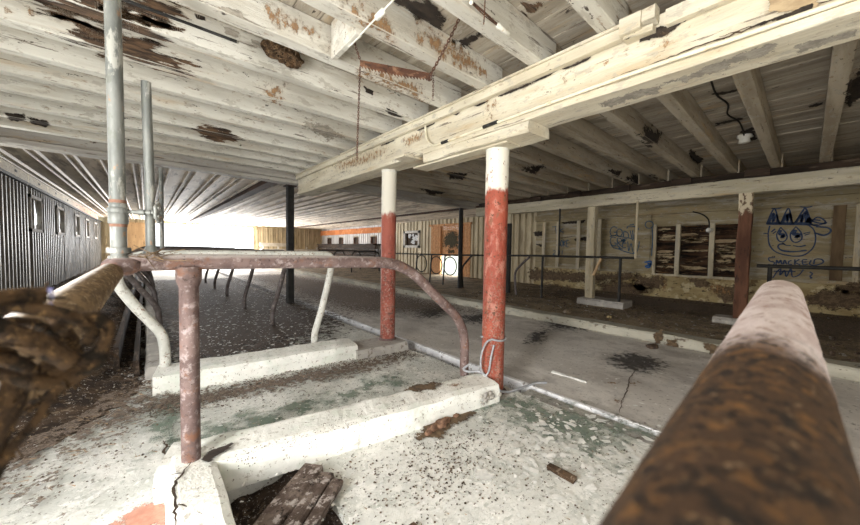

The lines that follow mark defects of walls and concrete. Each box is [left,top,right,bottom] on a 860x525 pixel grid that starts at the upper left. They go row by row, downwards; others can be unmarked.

peeling [25,0,105,58]
peeling [121,0,202,79]
crack [614,366,640,413]
water stain [605,353,668,373]
crack [171,462,191,525]